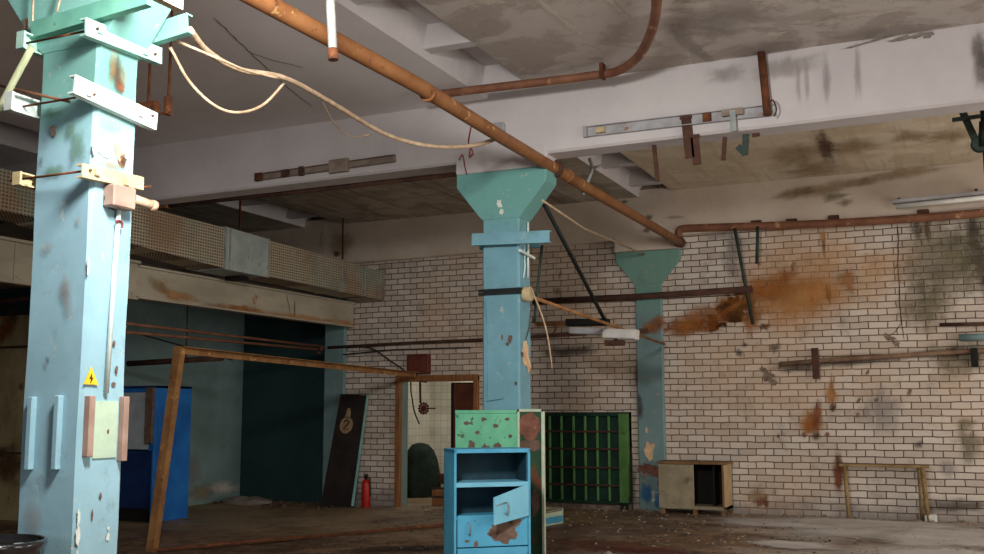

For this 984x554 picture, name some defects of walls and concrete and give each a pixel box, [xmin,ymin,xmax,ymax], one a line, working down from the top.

rust [112,59,124,92]
damp [819,134,833,157]
rust [639,273,831,334]
peeling [501,335,531,373]
rust [802,378,836,439]
peeling [637,427,659,502]
rust [834,455,843,487]